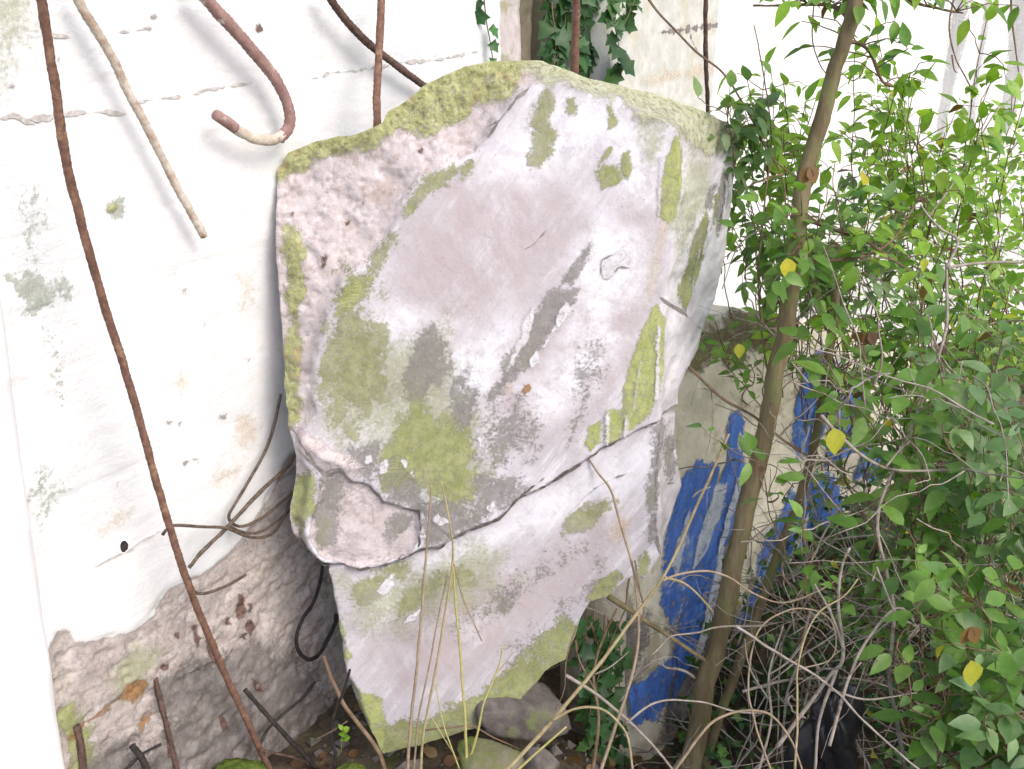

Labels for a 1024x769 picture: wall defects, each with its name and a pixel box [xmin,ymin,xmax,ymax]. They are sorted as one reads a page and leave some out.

spalling [36,0,427,769]
crack [290,405,677,571]
rust [192,625,216,664]
rust [225,594,256,635]